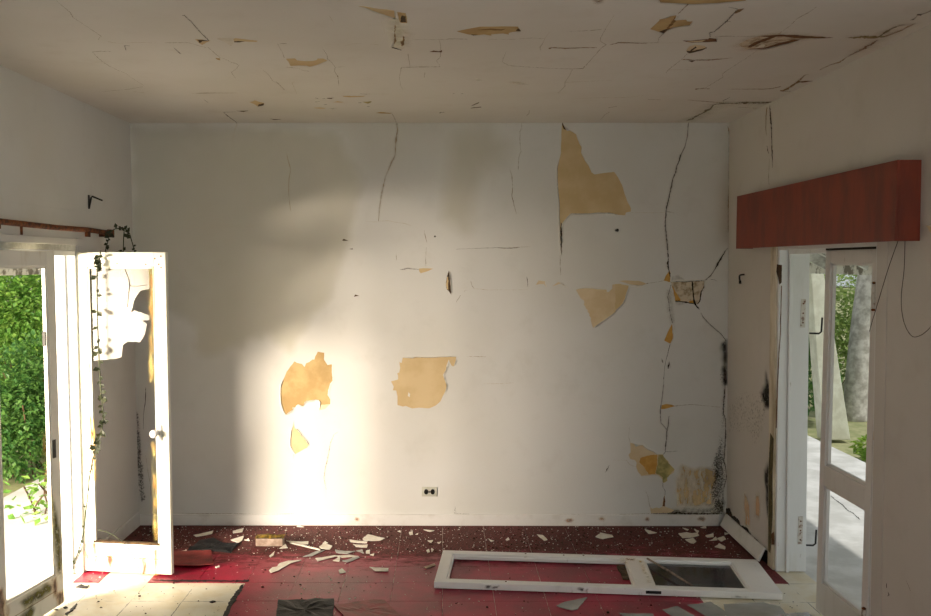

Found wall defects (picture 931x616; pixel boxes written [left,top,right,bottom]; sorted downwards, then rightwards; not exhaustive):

peeling [457,26,524,36]
peeling [651,0,746,34]
peeling [739,31,826,50]
peeling [555,123,631,255]
crack [646,7,931,323]
peeling [576,280,647,328]
spalling [664,270,706,309]
peeling [279,352,335,454]
peeling [391,355,457,408]
crack [660,345,727,512]